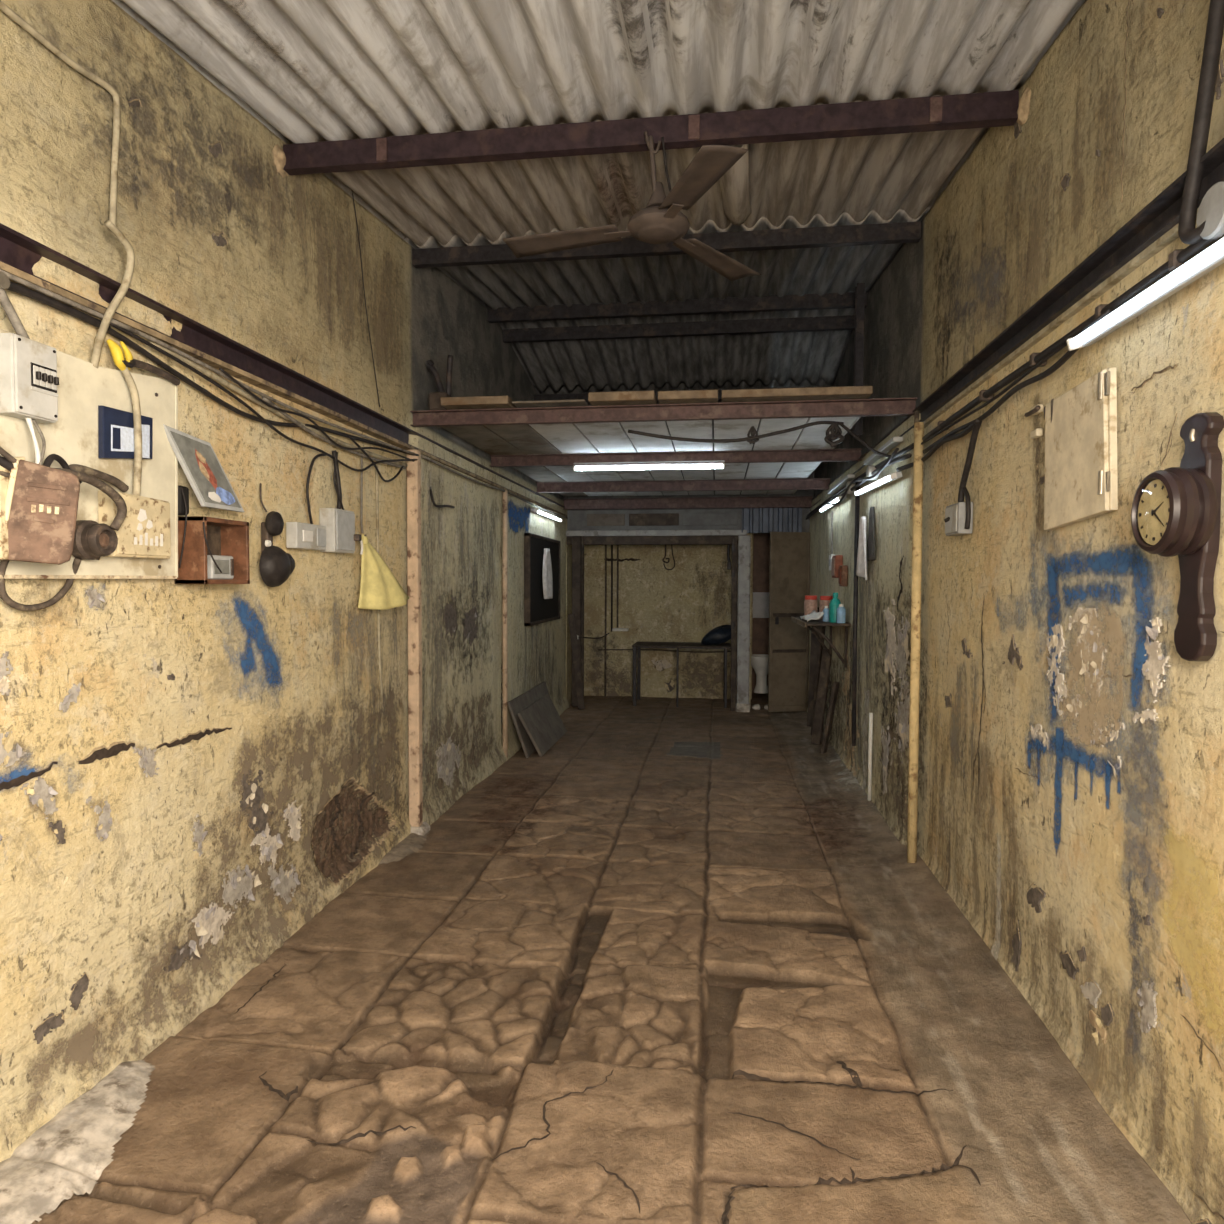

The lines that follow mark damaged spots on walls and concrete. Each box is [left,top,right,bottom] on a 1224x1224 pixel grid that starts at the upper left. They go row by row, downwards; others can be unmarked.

leakage [615,0,681,66]
leakage [79,56,399,368]
crack [0,727,232,791]
leakage [422,472,503,824]
leakage [823,545,1028,960]
peeling [1046,607,1171,776]
leakage [21,601,409,1124]
flaking render [163,770,397,972]
leakage [1012,836,1171,1168]
crack [492,1069,614,1160]
crack [596,1162,640,1213]
crack [721,1112,981,1224]